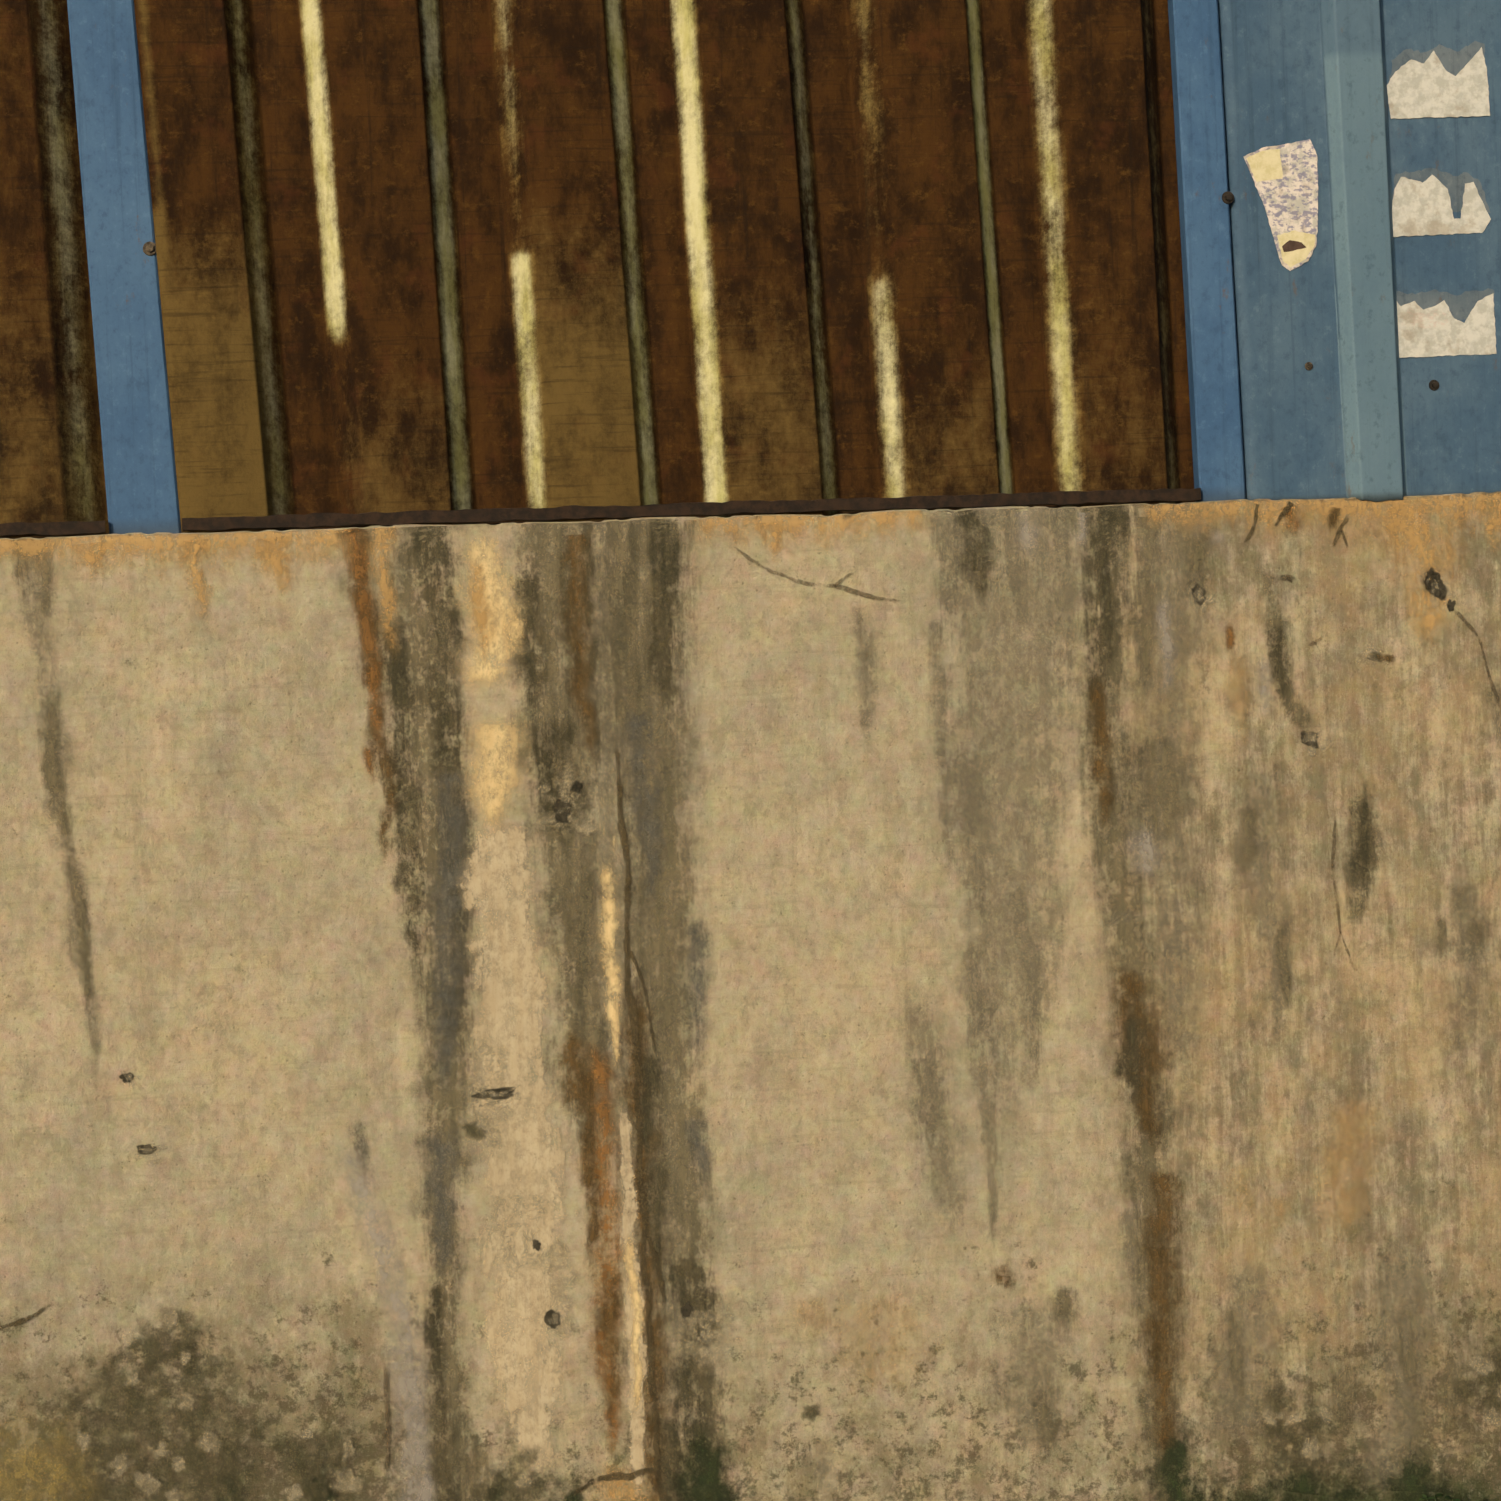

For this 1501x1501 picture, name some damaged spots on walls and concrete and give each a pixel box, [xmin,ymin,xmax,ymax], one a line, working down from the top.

water stain [13,540,97,1045]
rust [0,527,397,848]
water stain [346,519,736,1501]
rust [582,1054,624,1447]
crack [575,750,667,1501]
water stain [932,504,1208,1501]
water stain [1347,785,1377,915]
crack [1457,612,1500,703]